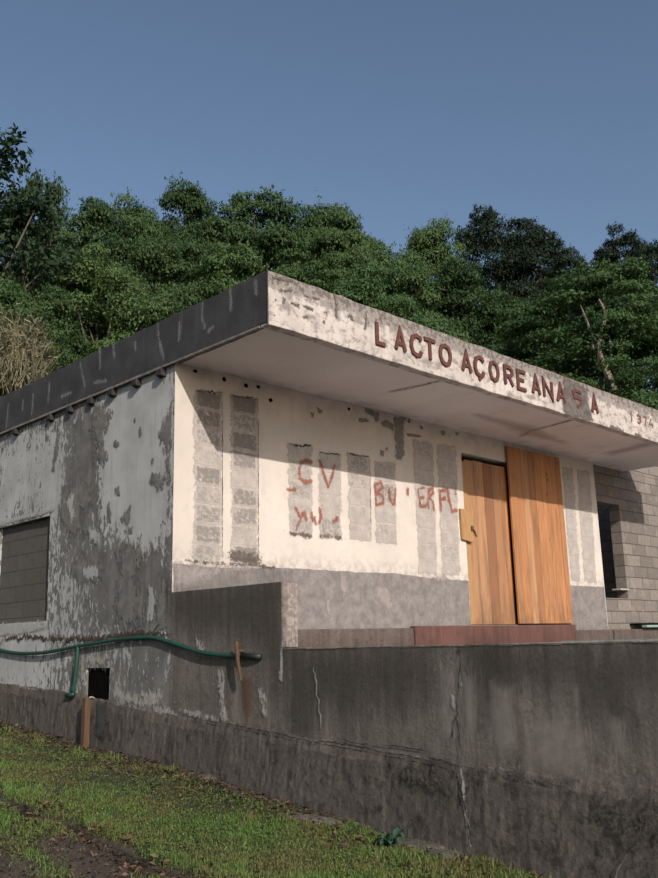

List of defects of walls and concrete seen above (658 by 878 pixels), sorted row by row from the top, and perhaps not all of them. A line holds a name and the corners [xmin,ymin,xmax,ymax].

peeling [51,423,60,473]
peeling [89,399,119,469]
peeling [0,478,275,637]
peeling [149,399,173,542]
peeling [290,531,341,540]
crack [197,648,473,847]